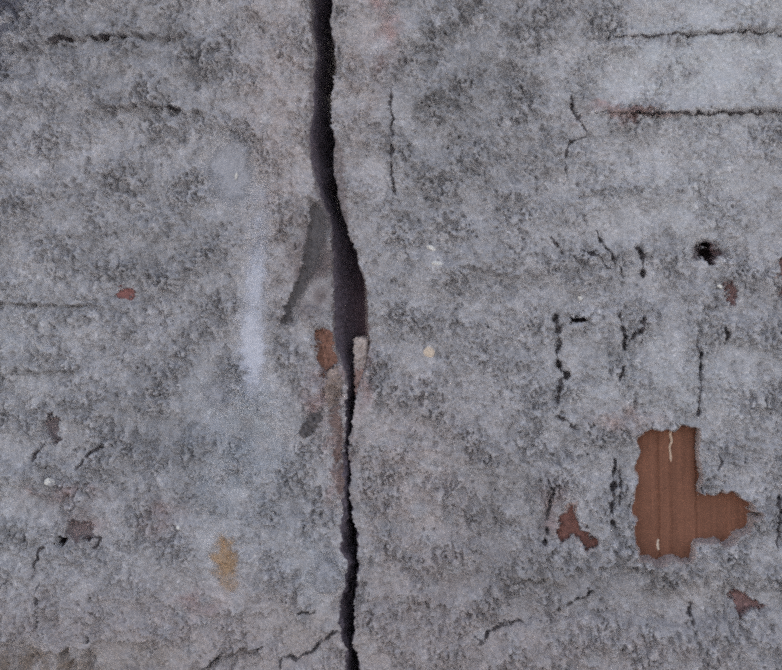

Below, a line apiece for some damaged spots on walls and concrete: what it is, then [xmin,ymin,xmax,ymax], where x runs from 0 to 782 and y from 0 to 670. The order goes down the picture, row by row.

crack [564,94,780,181]
crack [279,0,372,670]
spalling [556,501,598,554]
spalling [632,425,765,568]